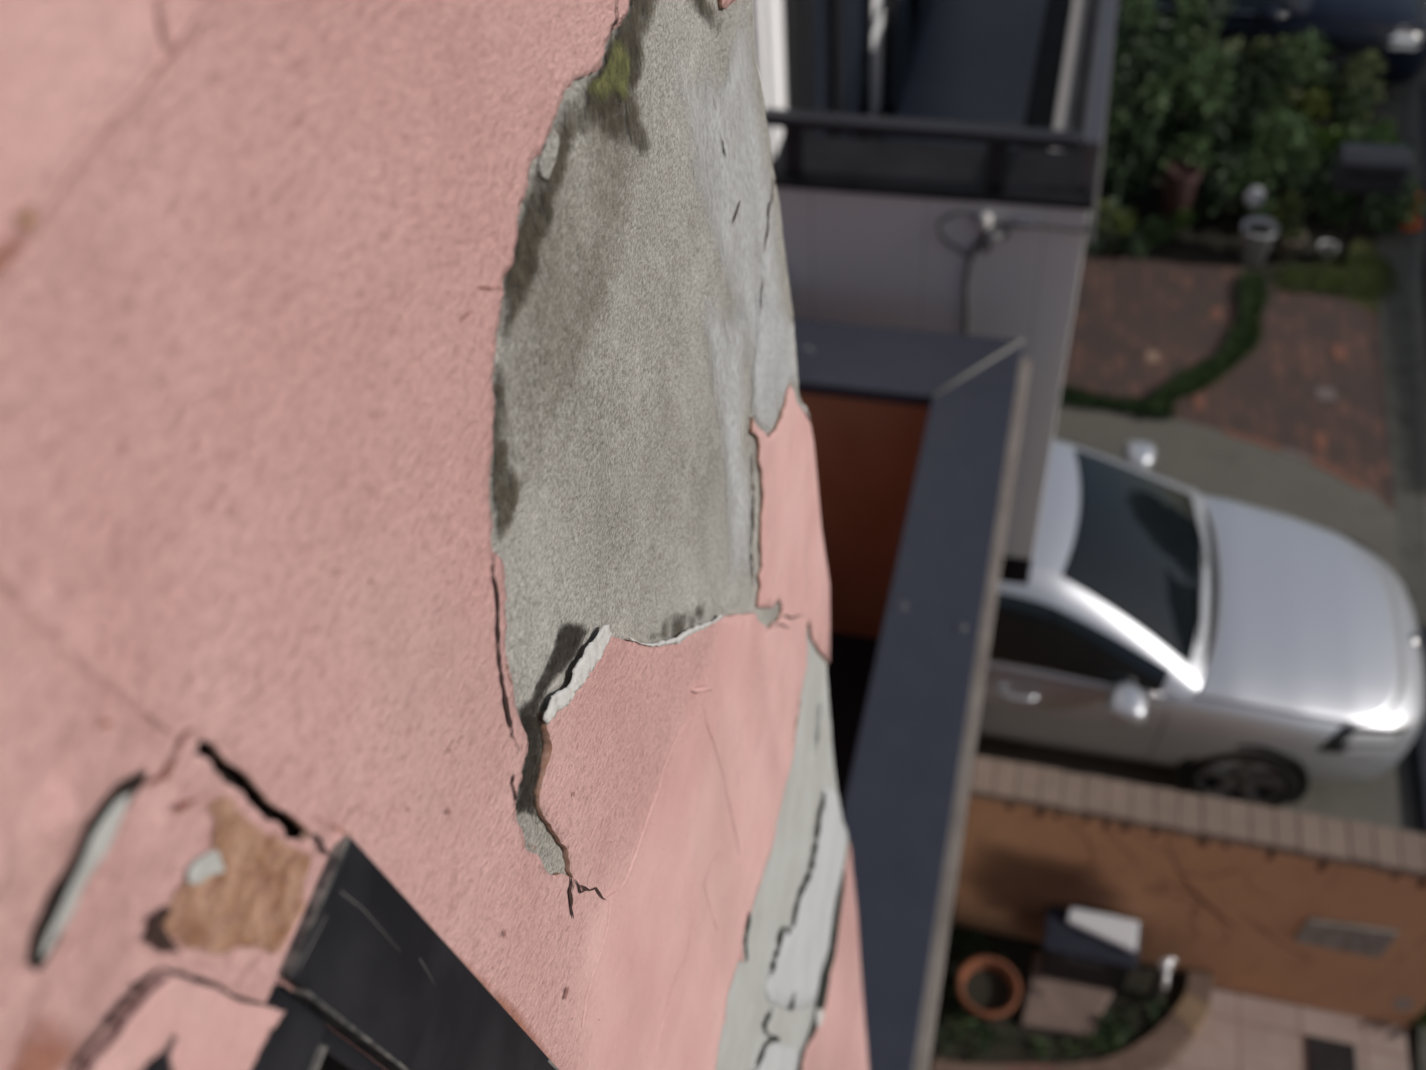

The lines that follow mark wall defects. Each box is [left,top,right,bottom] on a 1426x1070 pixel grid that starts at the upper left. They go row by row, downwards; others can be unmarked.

crack [607,0,619,48]
peeling [489,0,810,740]
spalling [145,741,311,954]
peeling [515,764,568,876]
peeling [716,626,848,1070]